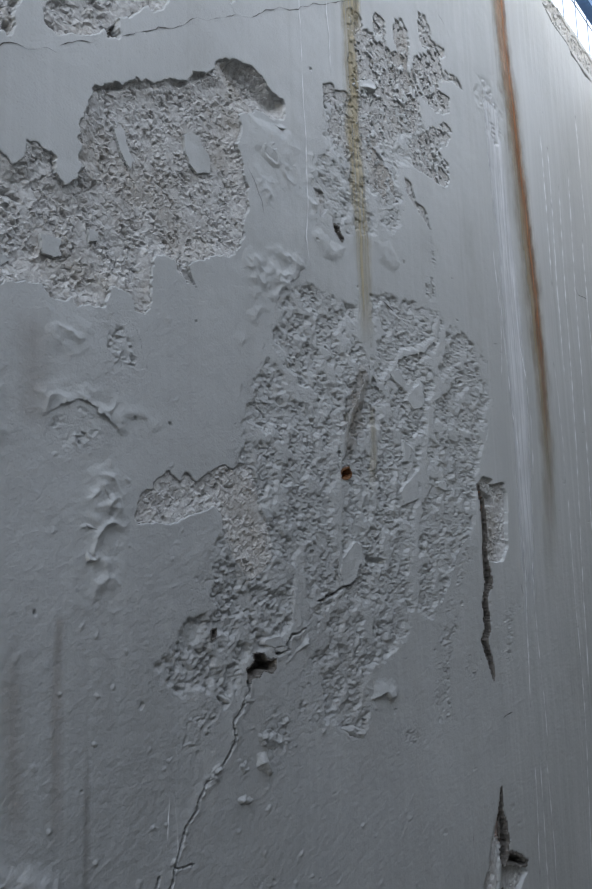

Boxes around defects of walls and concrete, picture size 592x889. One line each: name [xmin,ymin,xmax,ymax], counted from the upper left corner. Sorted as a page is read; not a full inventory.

spalling [0,0,20,36]
crack [0,40,92,52]
spalling [40,0,167,37]
crack [124,1,344,36]
spalling [0,60,287,398]
corrosion [494,0,549,456]
spalling [134,11,508,772]
crack [476,483,495,681]
peeling [0,862,60,889]
crack [497,786,529,889]